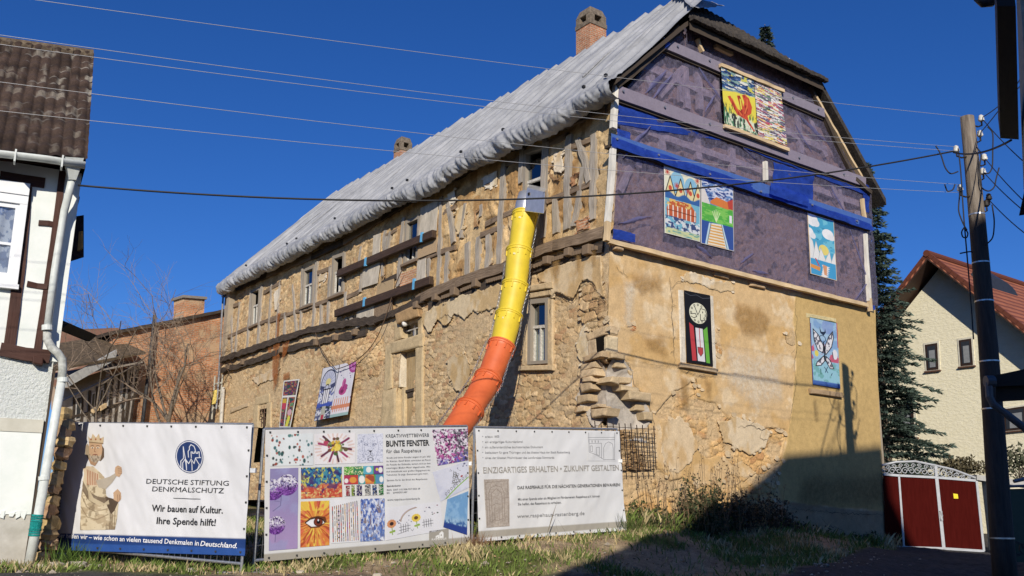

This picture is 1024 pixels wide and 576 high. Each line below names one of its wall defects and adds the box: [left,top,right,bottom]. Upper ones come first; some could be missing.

peeling [422,284,501,332]
spalling [537,255,788,518]